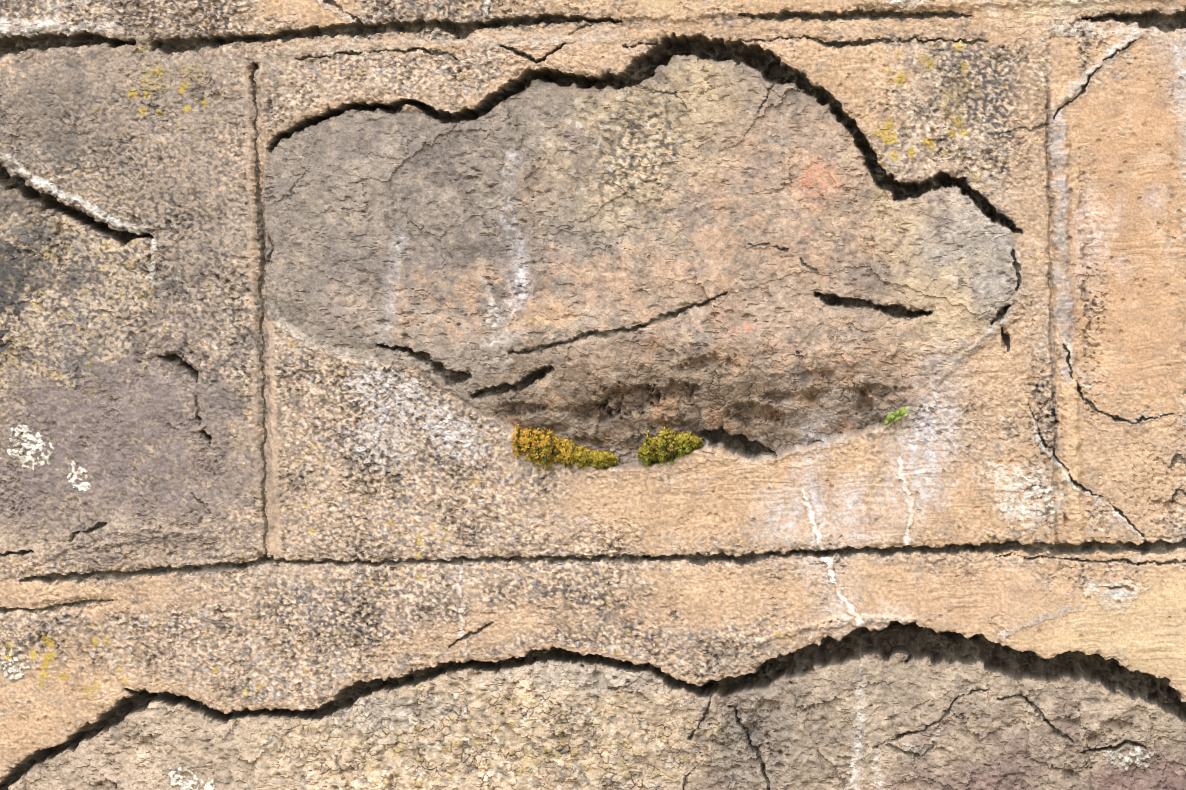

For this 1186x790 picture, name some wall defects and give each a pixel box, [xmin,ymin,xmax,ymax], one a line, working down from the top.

crack [48,0,102,10]
crack [295,0,458,62]
crack [0,151,158,288]
spalling [263,55,1015,468]
crack [266,17,1023,352]
crack [377,292,728,399]
crack [1060,336,1186,426]
crack [999,407,1186,566]
crack [0,621,1186,790]